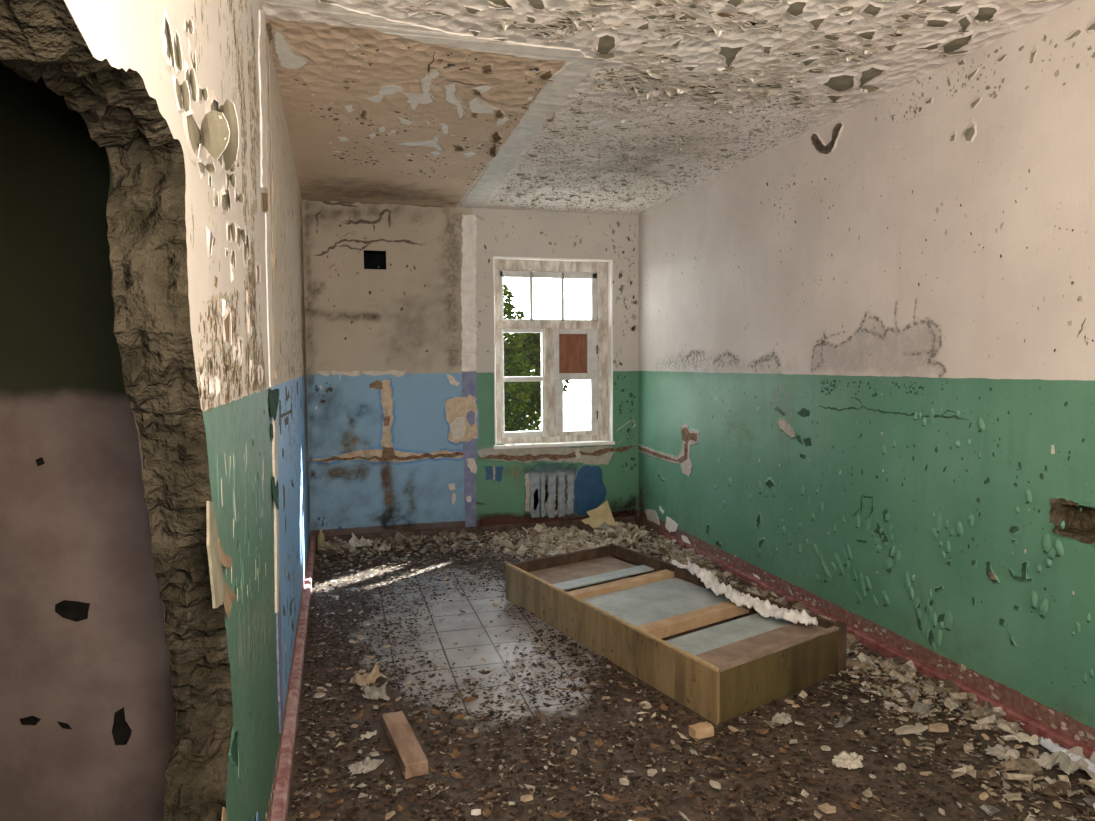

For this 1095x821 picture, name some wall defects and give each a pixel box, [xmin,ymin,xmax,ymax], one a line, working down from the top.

crack [307,200,443,269]
peeling [364,0,1095,348]
damp [812,302,946,377]
spalling [0,0,700,821]
spalling [744,379,942,506]
crack [819,397,967,420]
spalling [1010,445,1078,487]
spalling [946,484,1095,607]